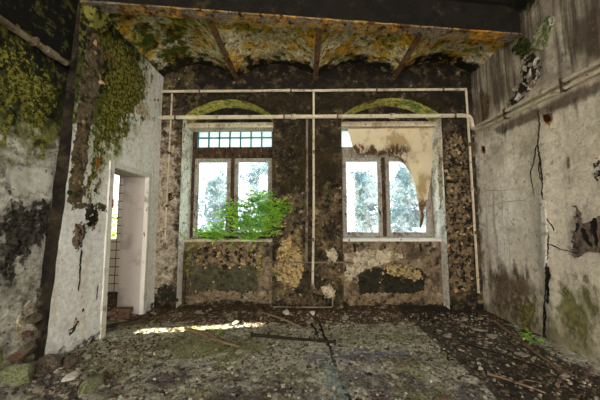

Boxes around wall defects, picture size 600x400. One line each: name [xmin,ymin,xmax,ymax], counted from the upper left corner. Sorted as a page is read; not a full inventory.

spalling [506,14,556,108]
spalling [67,26,107,252]
water stain [0,162,53,285]
peeling [325,248,426,295]
water stain [489,263,534,320]
peeling [570,205,600,258]